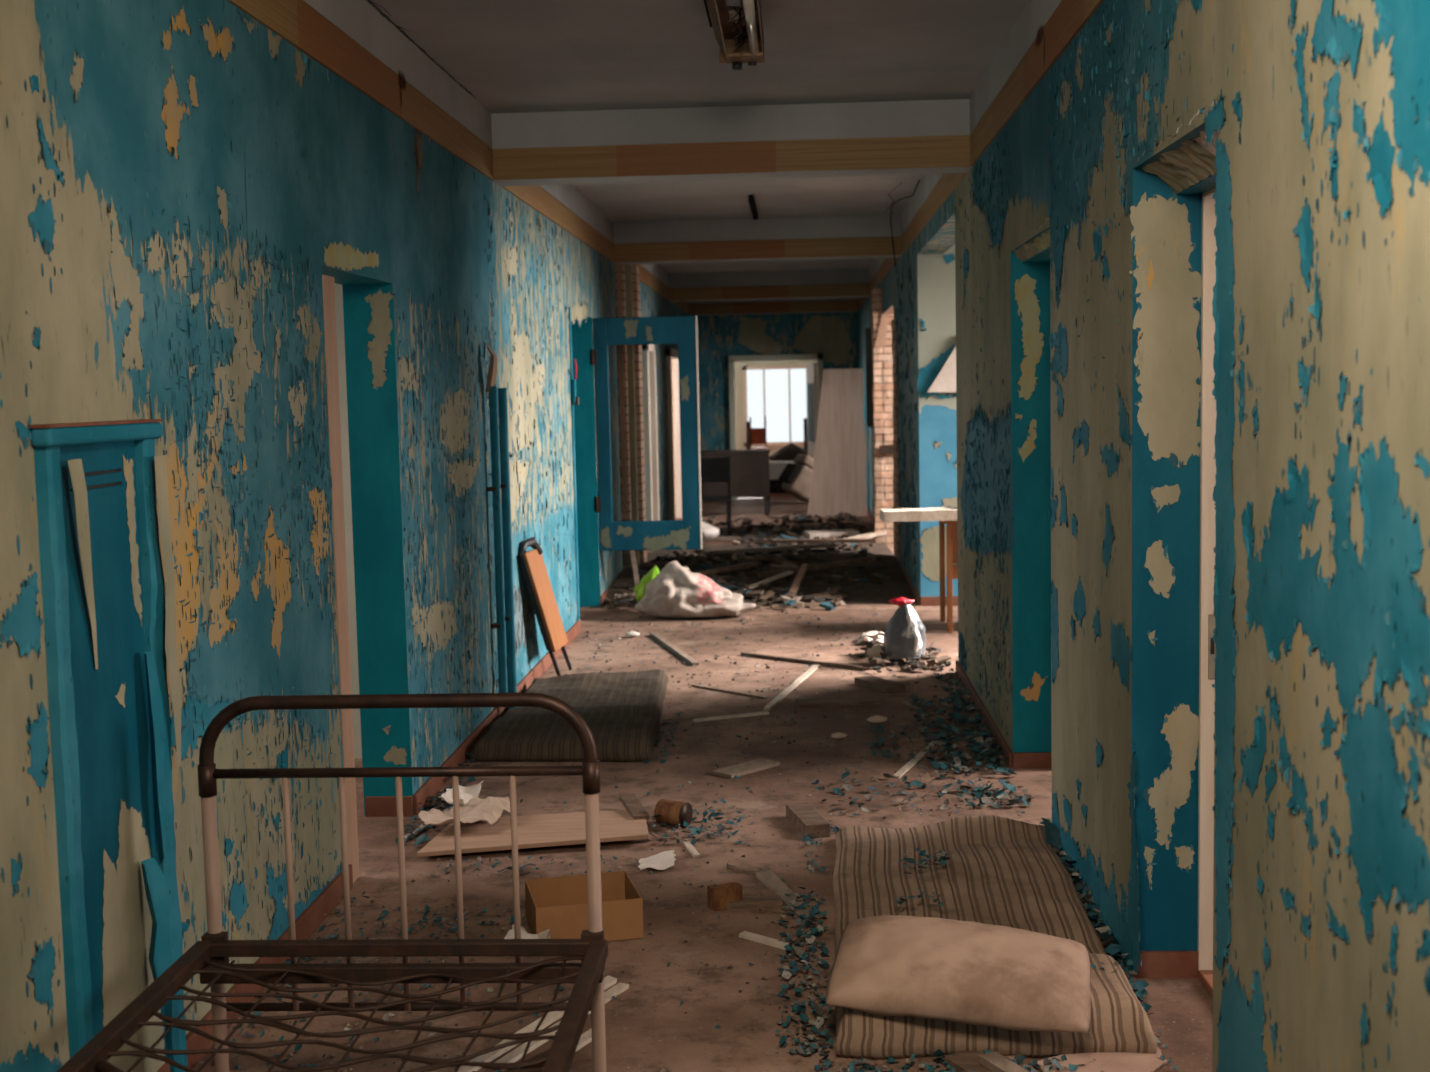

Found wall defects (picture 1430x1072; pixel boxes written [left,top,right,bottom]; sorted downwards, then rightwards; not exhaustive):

peeling [70,48,84,104]
peeling [161,0,311,161]
peeling [6,75,65,293]
peeling [25,311,41,398]
peeling [13,415,32,457]
peeling [66,459,98,669]
peeling [365,155,588,767]
peeling [875,0,1430,1072]
peeling [0,535,53,807]
peeling [1,852,30,897]
peeling [0,928,62,1072]
peeling [107,1009,165,1072]